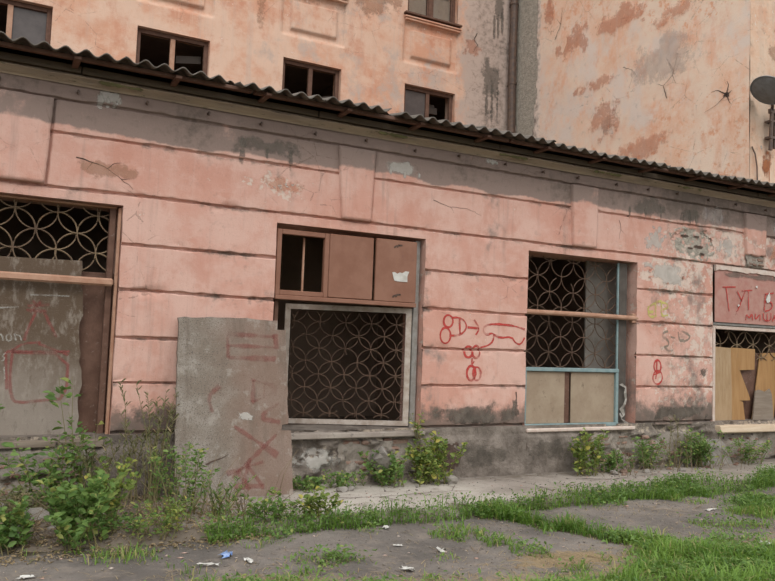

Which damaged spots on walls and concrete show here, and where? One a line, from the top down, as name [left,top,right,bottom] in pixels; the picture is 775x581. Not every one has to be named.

leakage [493,0,504,38]
leakage [483,58,500,117]
crack [76,157,132,188]
spalling [646,227,764,269]
leakage [433,400,519,427]
flaking render [292,438,430,476]